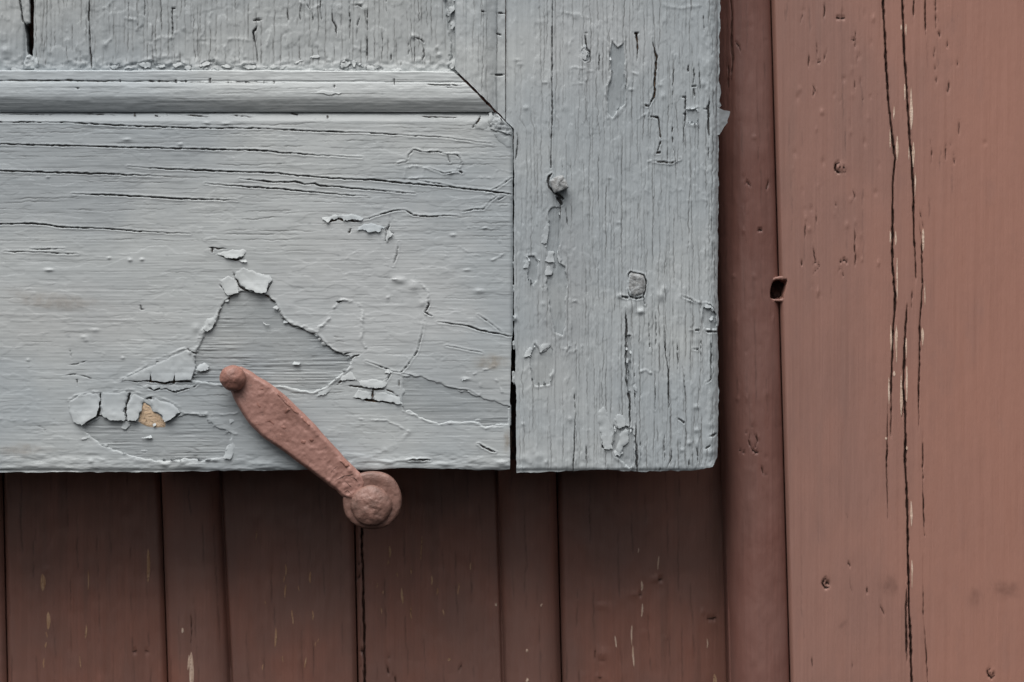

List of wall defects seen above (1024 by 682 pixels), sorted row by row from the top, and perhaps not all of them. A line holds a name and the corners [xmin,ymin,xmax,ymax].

crack [18,0,182,82]
crack [252,1,425,61]
peeling [608,43,627,117]
crack [634,32,709,163]
crack [0,112,518,258]
peeling [322,214,393,242]
peeling [68,249,511,461]
crack [622,272,715,468]
crack [848,0,958,682]
peeling [598,407,637,468]